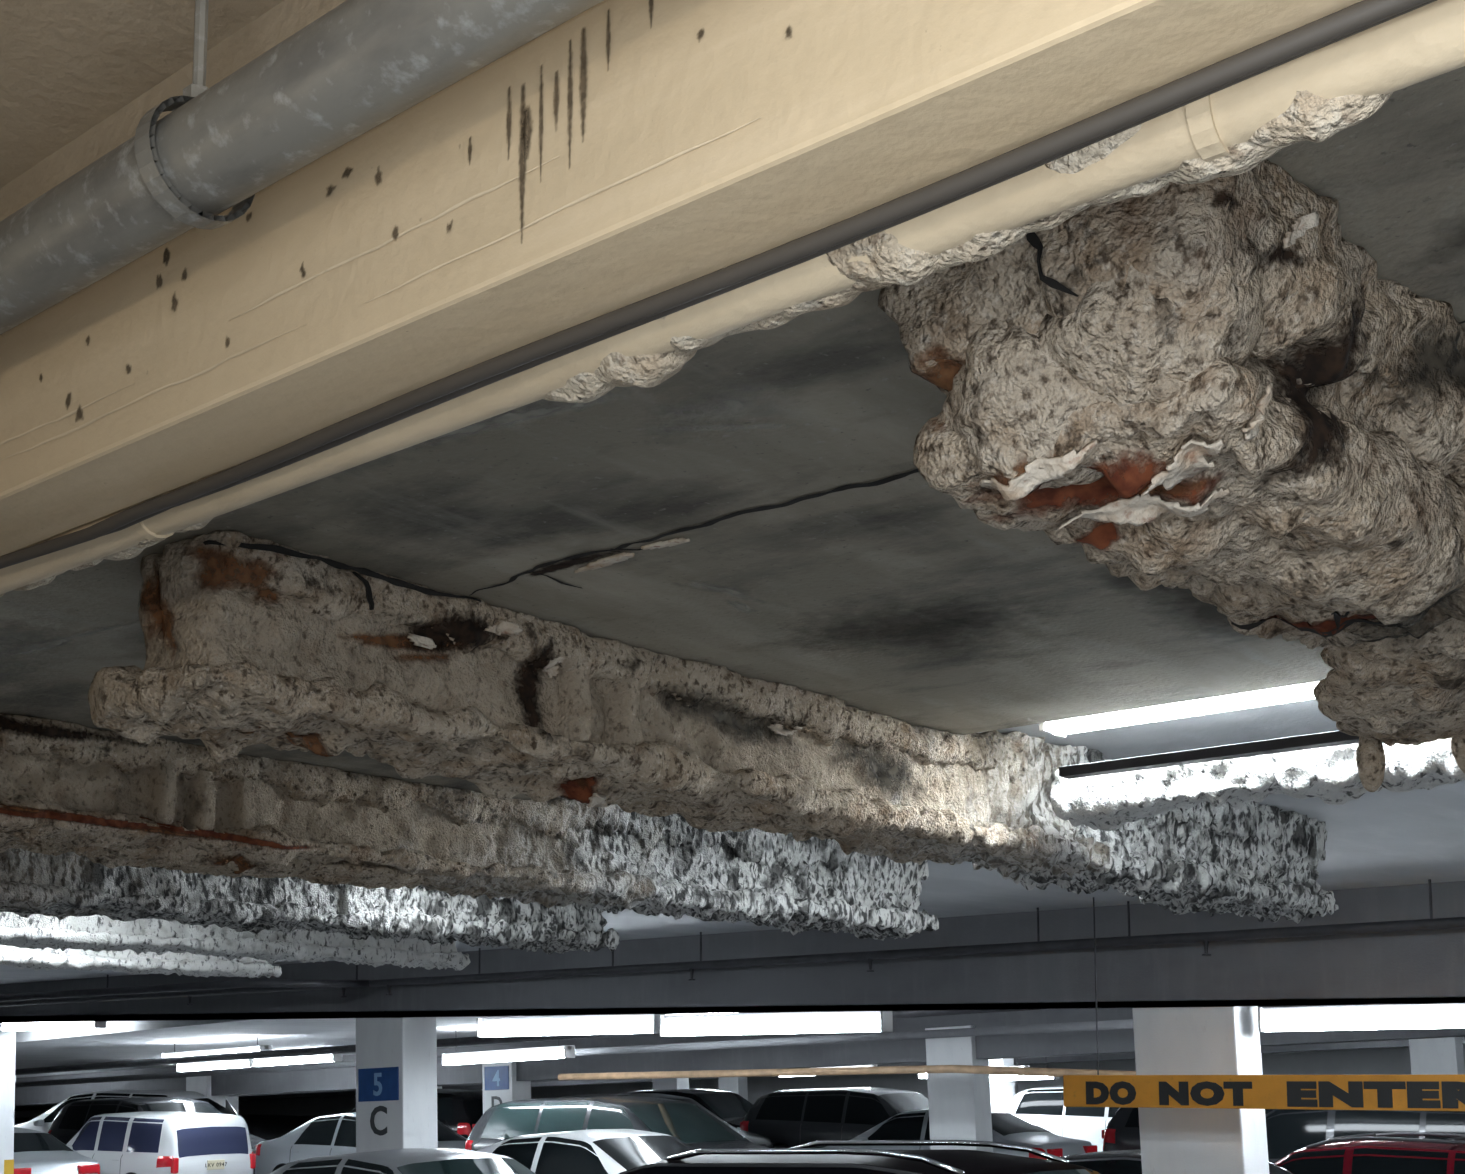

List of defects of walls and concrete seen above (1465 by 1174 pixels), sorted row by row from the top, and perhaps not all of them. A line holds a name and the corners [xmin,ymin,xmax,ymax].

spalling [1212,192,1238,209]
spalling [1262,211,1319,266]
spalling [1241,296,1368,490]
rust [979,439,1230,550]
crack [203,468,919,610]
spalling [407,616,523,652]
spalling [514,637,566,740]
spalling [660,687,802,742]
spalling [840,744,924,792]
rust [0,803,317,874]